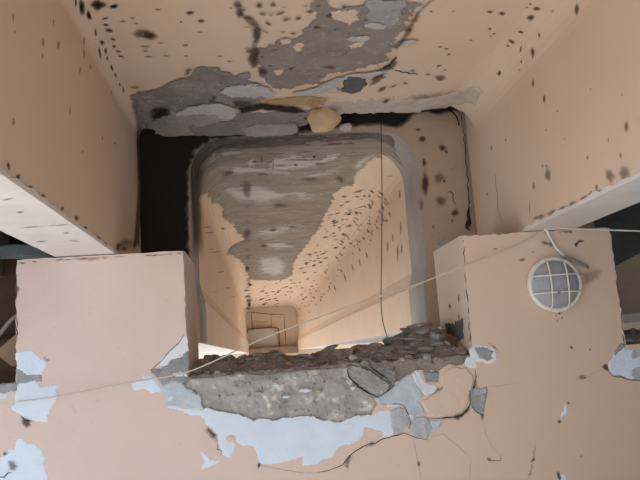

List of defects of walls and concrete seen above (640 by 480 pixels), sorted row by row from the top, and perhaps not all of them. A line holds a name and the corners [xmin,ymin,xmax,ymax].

mould [75,0,117,19]
leakage [234,2,271,75]
leakage [134,100,317,255]
peeling [131,0,483,281]
leakage [335,112,417,127]
crack [421,108,472,232]
leakage [260,190,390,309]
flaking render [445,309,497,368]
peeling [0,350,57,427]
spalling [132,332,442,470]
peeling [0,438,48,480]
crack [318,433,471,479]